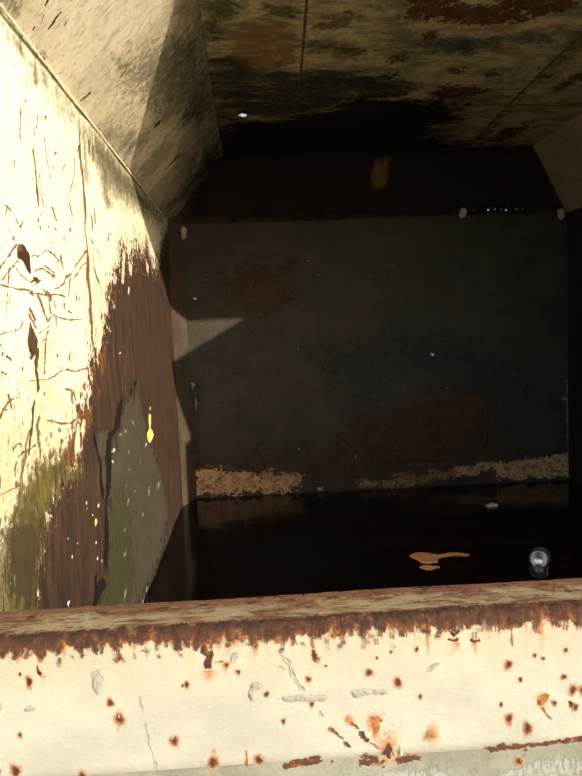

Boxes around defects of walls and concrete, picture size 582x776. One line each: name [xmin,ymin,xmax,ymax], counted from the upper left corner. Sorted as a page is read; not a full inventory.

rust [396,0,582,40]
damp [112,0,559,222]
crack [89,379,170,606]
damp [3,453,54,612]
rust [19,665,44,689]
rust [107,698,125,727]
rust [201,642,240,678]
rust [290,635,328,667]
rust [562,674,582,712]
rust [282,755,334,770]
rust [347,716,422,768]
rust [483,722,582,765]